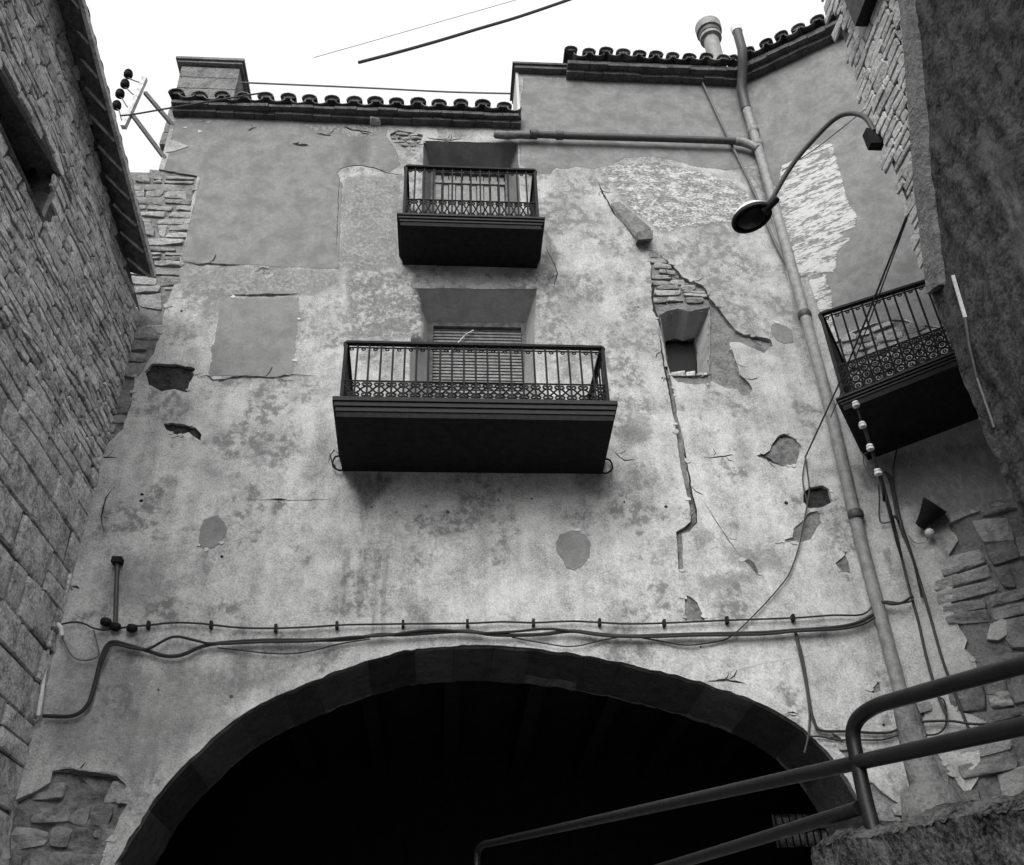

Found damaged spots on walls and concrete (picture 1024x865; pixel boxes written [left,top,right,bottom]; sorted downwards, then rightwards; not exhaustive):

peeling [779,143,857,327]
flaking render [108,170,422,442]
spalling [645,248,771,397]
spalling [758,436,801,467]
spalling [775,483,836,545]
flaking render [934,497,1024,667]
flaking render [916,701,932,719]
flaking render [948,675,1024,723]
flaking render [933,736,1024,801]
spalling [6,772,132,865]